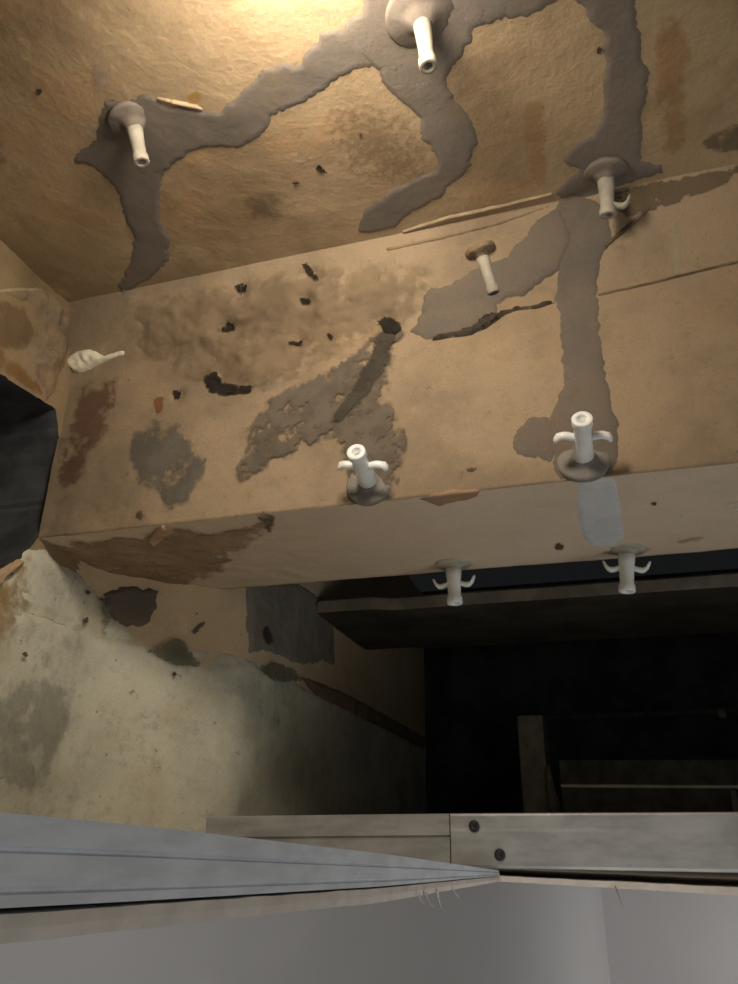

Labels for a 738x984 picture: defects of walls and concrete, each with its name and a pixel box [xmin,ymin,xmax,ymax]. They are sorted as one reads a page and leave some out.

crack [74,0,738,547]
leakage [130,422,206,508]
spalling [55,523,267,585]
spalling [304,677,428,748]